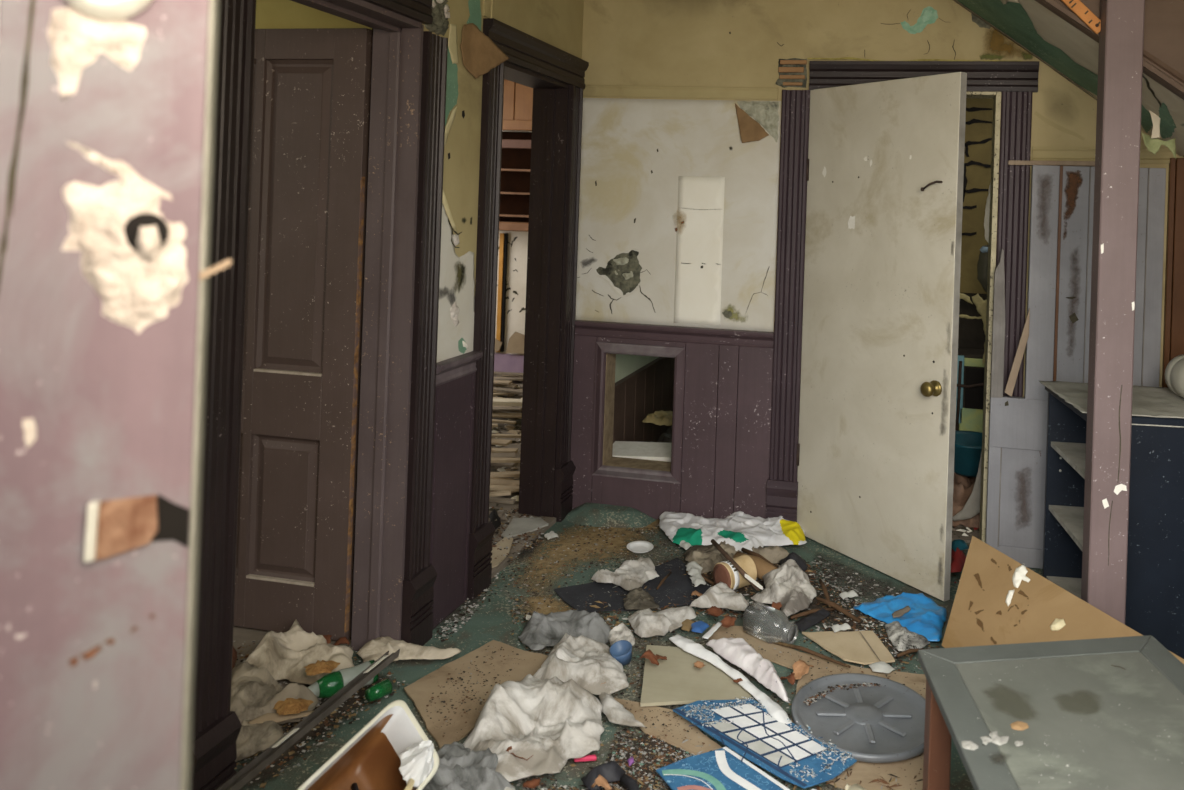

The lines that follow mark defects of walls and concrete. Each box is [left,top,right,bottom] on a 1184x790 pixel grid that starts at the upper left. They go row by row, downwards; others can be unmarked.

peeling [881,6,945,34]
peeling [907,0,1098,100]
flaking render [729,101,779,150]
peeling [1141,76,1176,158]
flaking render [437,203,475,362]
spalling [592,247,655,313]
peeling [22,418,36,448]